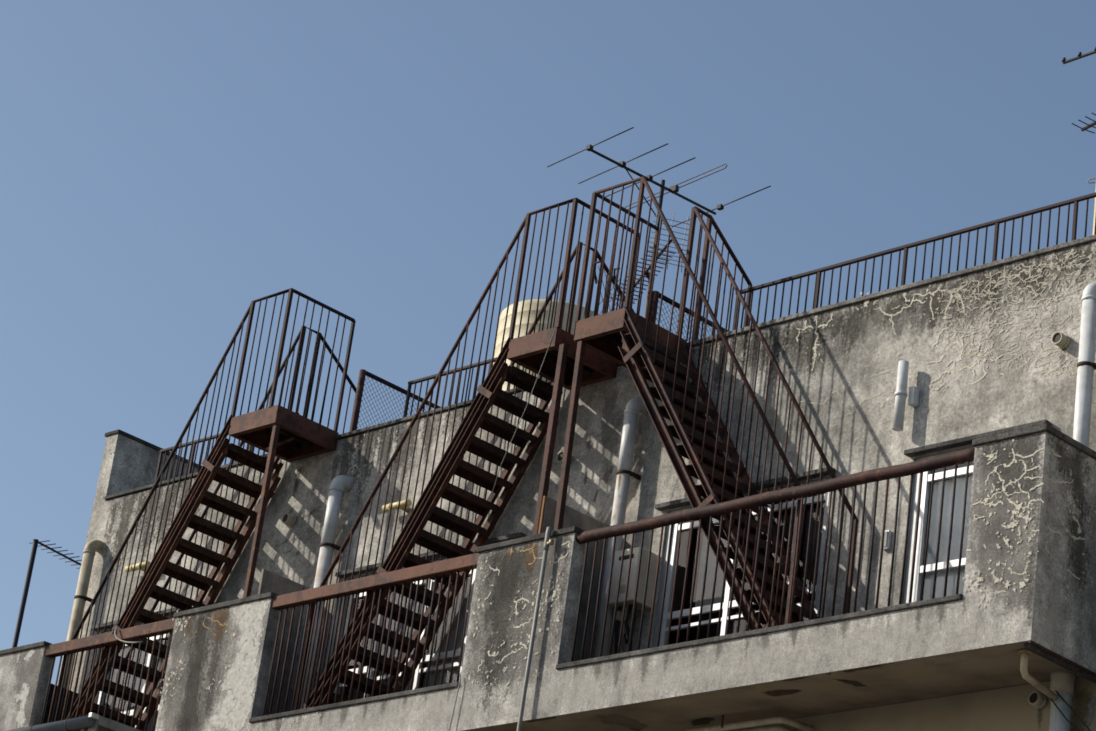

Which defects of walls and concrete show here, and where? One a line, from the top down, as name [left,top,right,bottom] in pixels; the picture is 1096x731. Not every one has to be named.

crack [786,241,1096,427]
leakage [178,614,225,731]
crack [467,541,570,623]
crack [971,437,1096,620]